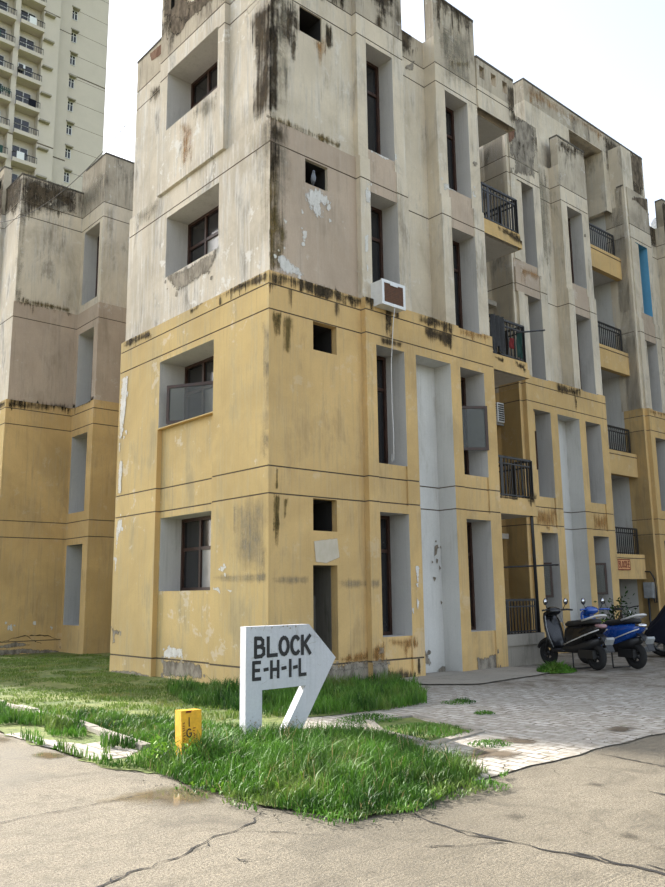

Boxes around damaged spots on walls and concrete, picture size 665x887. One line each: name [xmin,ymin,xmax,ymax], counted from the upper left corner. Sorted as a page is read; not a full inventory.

leakage [162,1,175,36]
leakage [371,0,392,27]
leakage [252,0,298,242]
leakage [508,87,523,123]
peeling [302,188,331,223]
leakage [650,205,665,245]
peeling [274,247,304,279]
leakage [219,273,374,314]
leakage [421,316,452,349]
leakage [0,398,93,413]
crack [97,814,291,887]
crack [412,811,665,875]